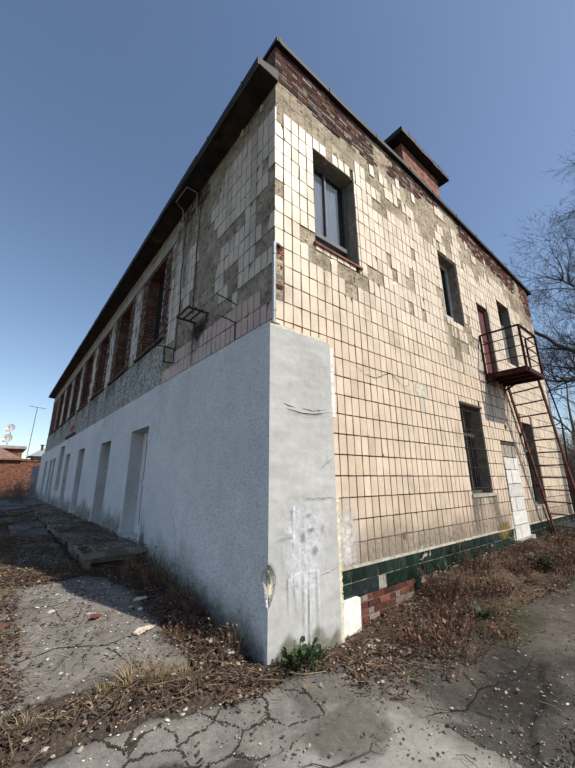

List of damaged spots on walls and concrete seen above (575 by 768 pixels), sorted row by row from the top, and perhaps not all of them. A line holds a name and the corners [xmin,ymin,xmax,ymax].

spalling [48,47,535,437]
spalling [262,565,276,608]
water stain [287,506,340,656]
water stain [273,638,300,665]
crack [96,689,325,768]